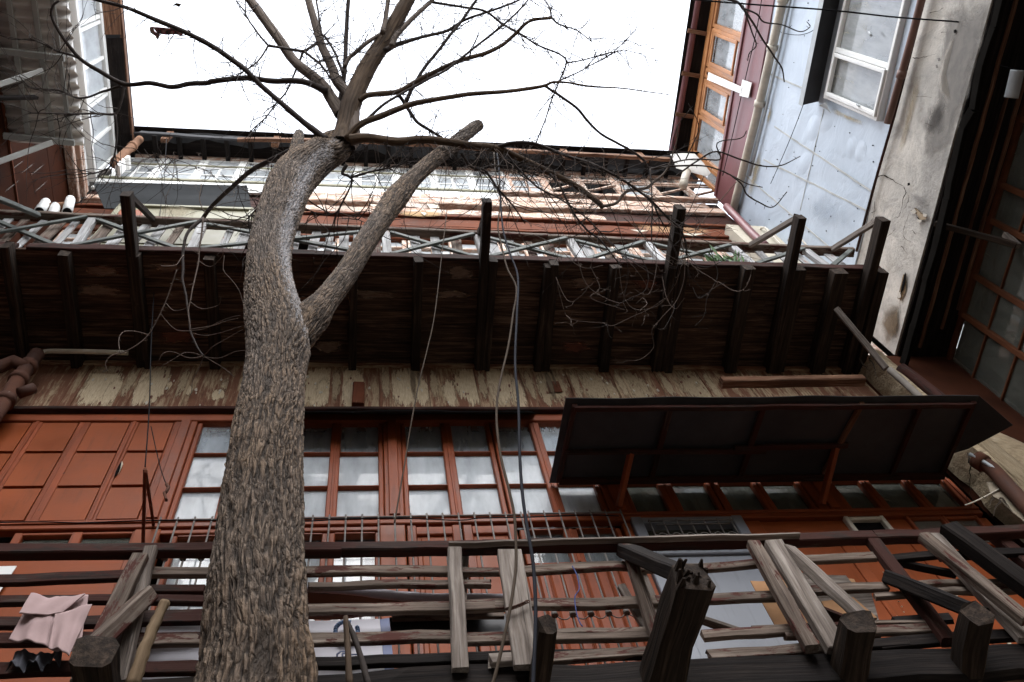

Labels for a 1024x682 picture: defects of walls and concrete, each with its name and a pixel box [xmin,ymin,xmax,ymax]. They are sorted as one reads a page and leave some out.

leakage [925,5,986,154]
crack [871,175,916,251]
peeling [77,366,229,406]
peeling [304,367,722,407]